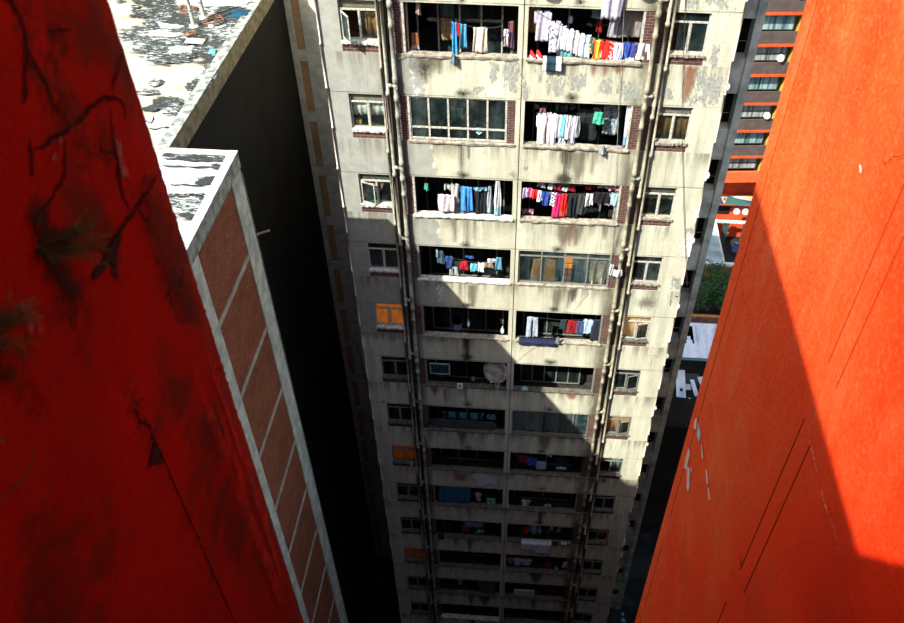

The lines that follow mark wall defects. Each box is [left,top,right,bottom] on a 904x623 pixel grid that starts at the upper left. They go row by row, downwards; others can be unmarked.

peeling [687,0,736,13]
peeling [688,45,730,107]
crack [7,0,211,277]
crack [130,398,155,442]
peeling [684,448,692,491]